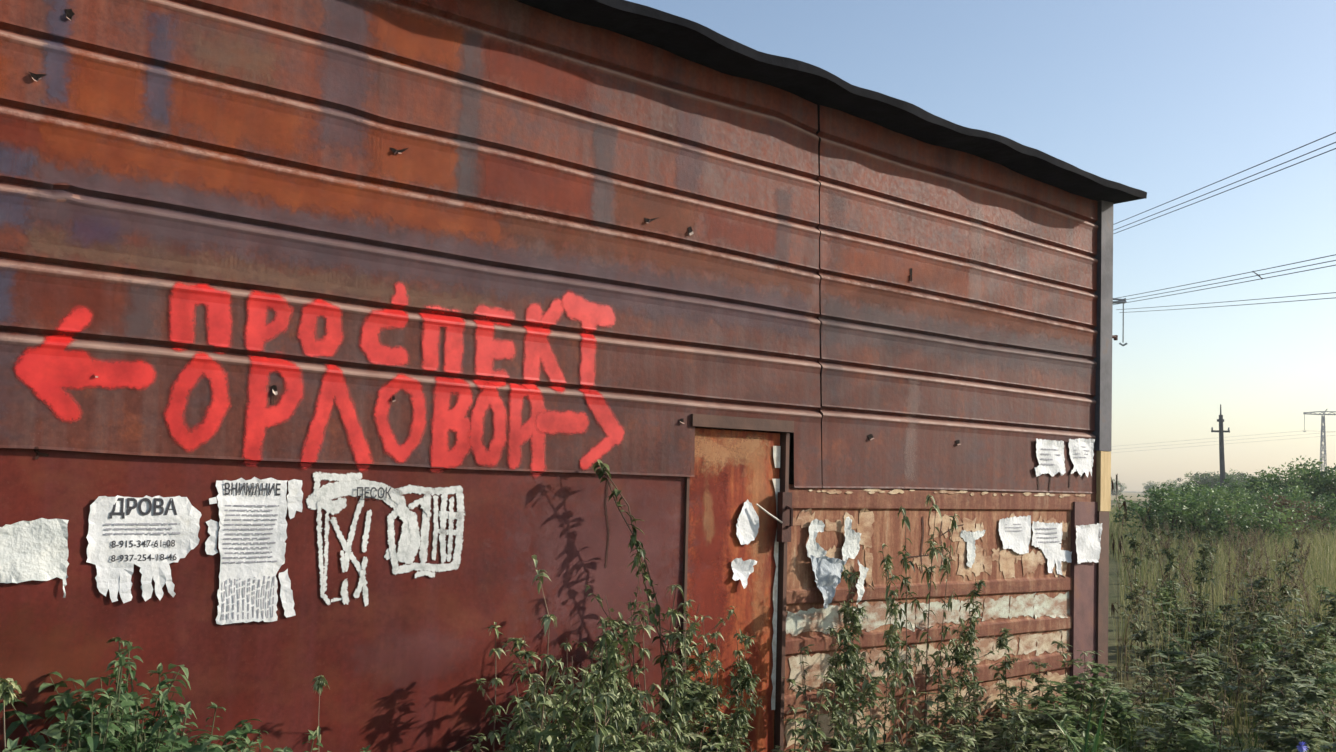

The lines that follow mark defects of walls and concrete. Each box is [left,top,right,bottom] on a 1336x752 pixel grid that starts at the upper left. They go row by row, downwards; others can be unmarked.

corrosion [370,3,463,68]
corrosion [41,122,814,294]
corrosion [827,279,1094,344]
corrosion [679,433,763,657]
peeling [786,489,1086,692]
peeling [784,698,891,748]
peeling [926,671,1068,721]